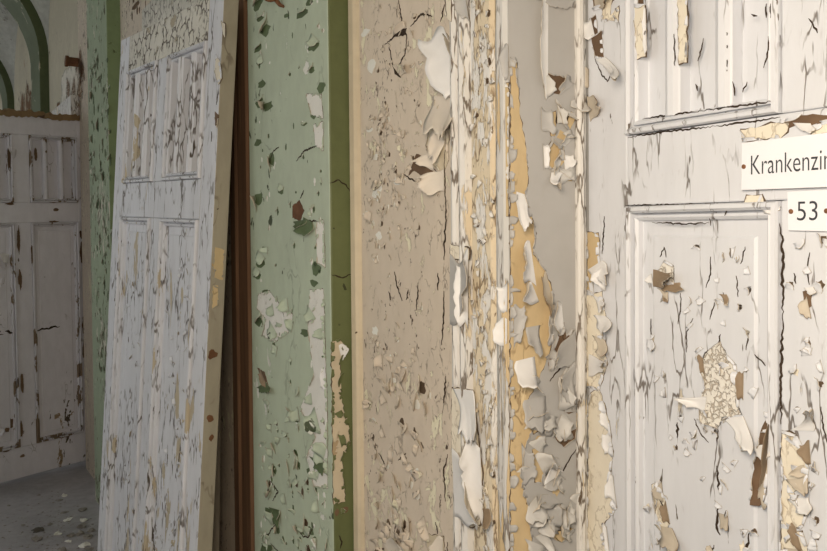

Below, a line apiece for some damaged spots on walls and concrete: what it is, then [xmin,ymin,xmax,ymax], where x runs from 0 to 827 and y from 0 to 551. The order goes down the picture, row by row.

peeling [633,0,648,60]
flaking render [61,66,80,103]
peeling [89,48,112,182]
peeling [785,114,827,134]
peeling [361,0,620,551]